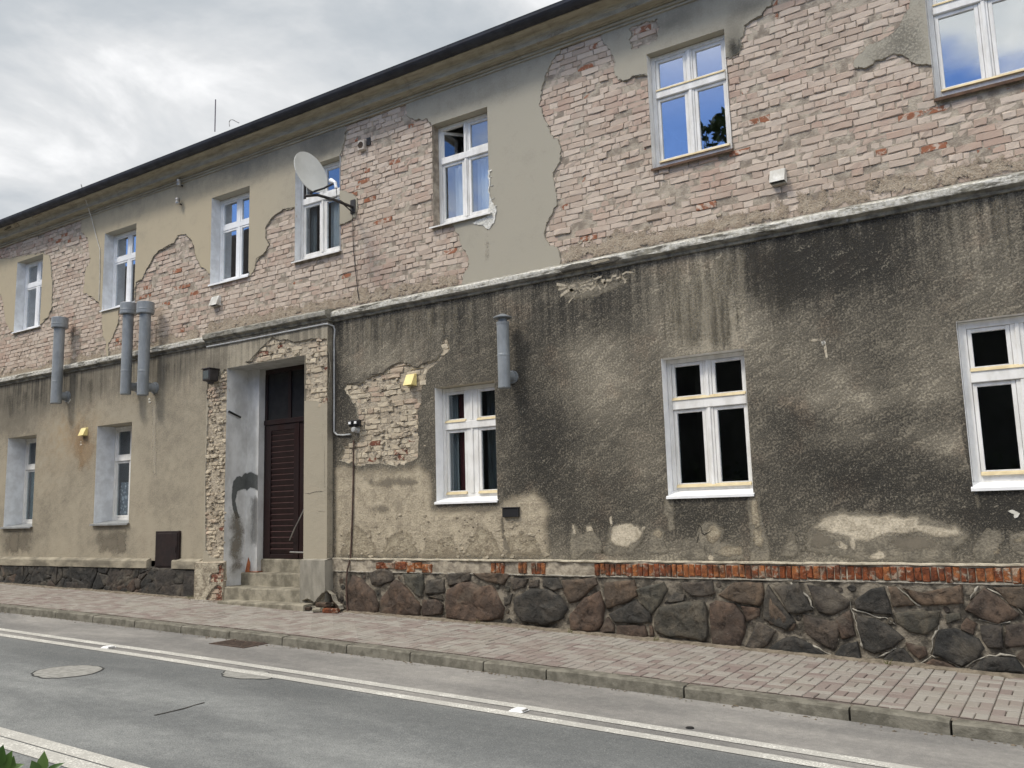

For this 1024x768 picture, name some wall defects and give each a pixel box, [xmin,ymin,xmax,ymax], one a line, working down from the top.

flaking render [539,0,1024,265]
flaking render [0,104,469,378]
water stain [556,271,633,303]
water stain [664,254,745,345]
flaking render [245,337,331,407]
flaking render [205,369,230,600]
flaking render [334,338,549,559]
flaking render [569,516,746,561]
water stain [750,497,763,546]
flaking render [781,507,1024,563]